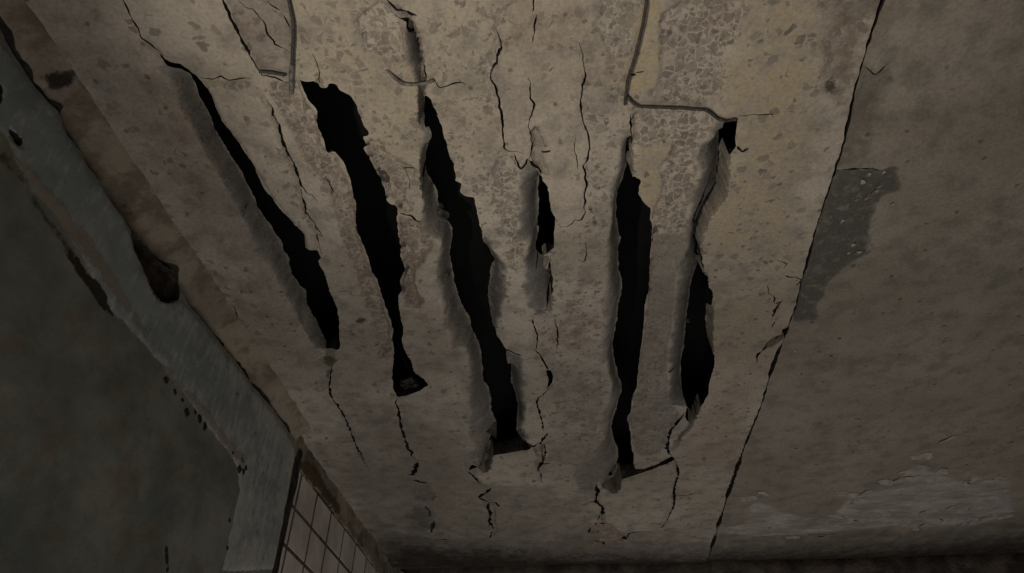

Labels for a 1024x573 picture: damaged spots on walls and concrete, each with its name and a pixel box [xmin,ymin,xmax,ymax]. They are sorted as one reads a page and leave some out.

peeling [0,45,295,572]
crack [322,357,369,468]
peeling [156,0,588,486]
crack [395,400,449,540]
crack [468,472,500,537]
crack [505,245,559,481]
crack [490,27,590,261]
crack [588,414,695,545]
spalling [572,0,749,533]
crack [756,260,802,362]